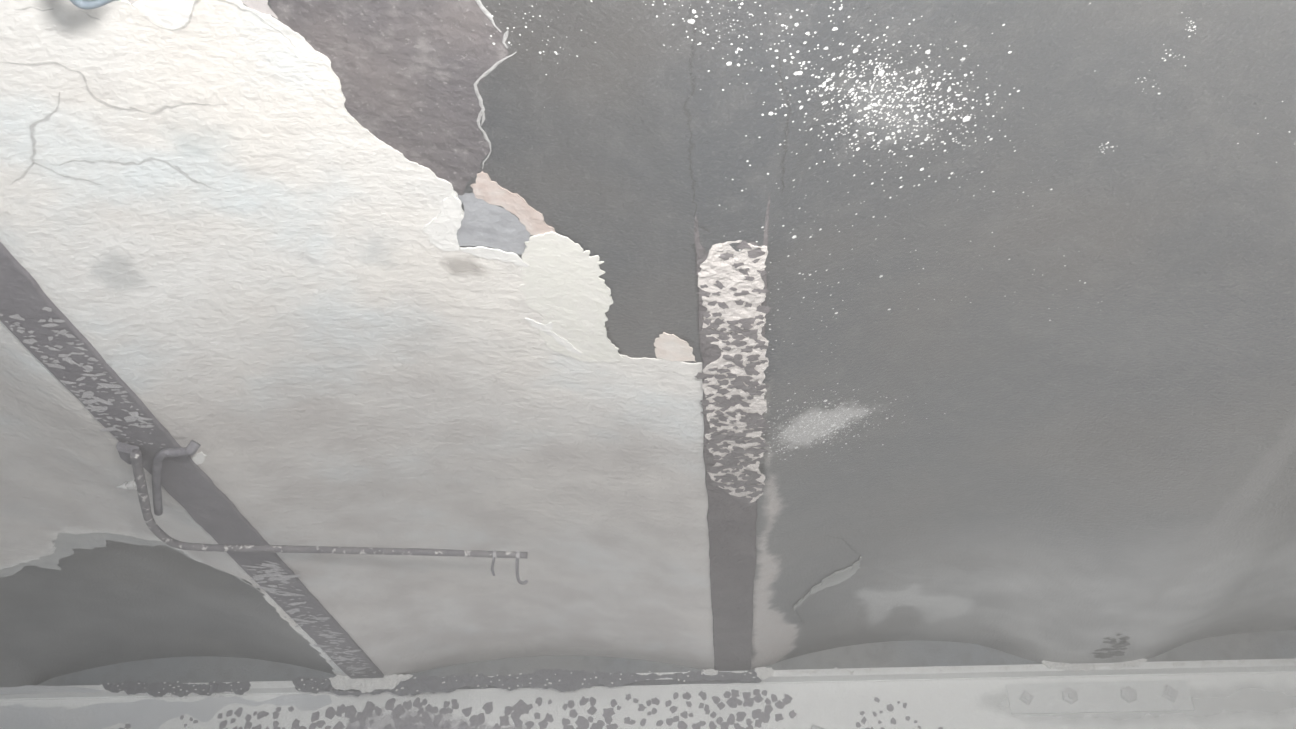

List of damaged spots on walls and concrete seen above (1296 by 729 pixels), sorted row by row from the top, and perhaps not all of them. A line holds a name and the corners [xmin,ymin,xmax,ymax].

water stain [645,0,1025,199]
peeling [0,0,889,679]
water stain [763,345,905,461]